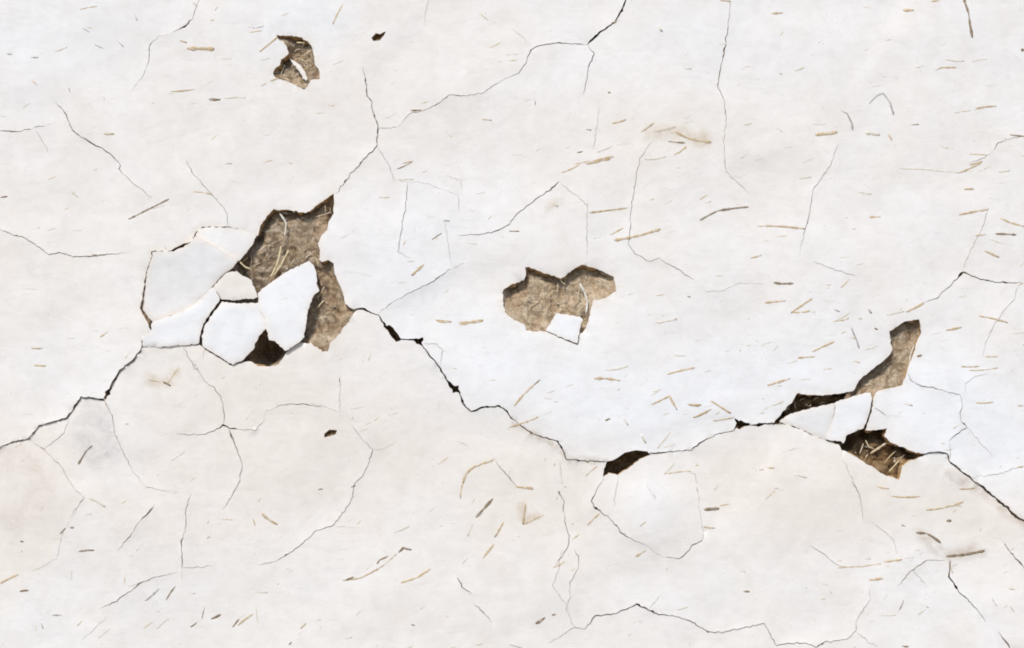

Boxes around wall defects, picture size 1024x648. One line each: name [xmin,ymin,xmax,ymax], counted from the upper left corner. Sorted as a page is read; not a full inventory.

flaking render [274,36,320,89]
crack [57,104,151,197]
flaking render [141,196,366,366]
flaking render [502,268,616,345]
crack [339,0,876,648]
crack [927,211,1021,343]
crack [1,345,206,640]
crack [185,349,393,565]
hole [603,450,649,475]
flaking render [775,320,922,478]
crack [909,375,1024,522]
crack [901,560,1010,648]